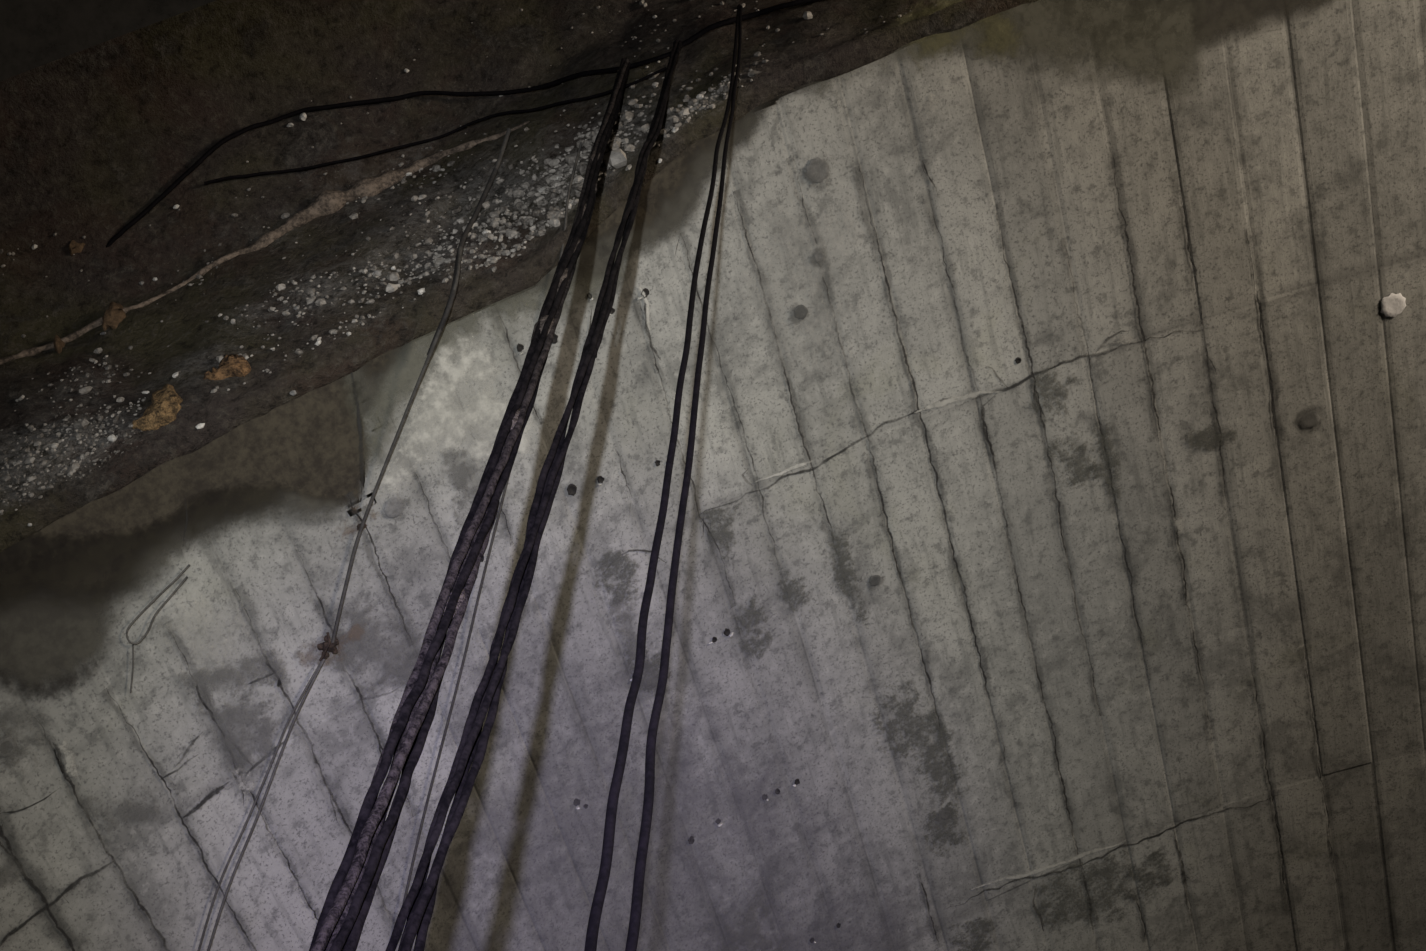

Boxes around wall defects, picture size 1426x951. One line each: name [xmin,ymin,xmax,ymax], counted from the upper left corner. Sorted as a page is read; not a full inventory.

damp [894,0,1331,89]
damp [563,108,757,306]
damp [349,266,557,490]
crack [712,331,1195,509]
damp [0,486,279,603]
crack [0,793,52,860]
crack [0,867,104,946]
crack [183,743,282,818]
crack [951,795,1277,932]